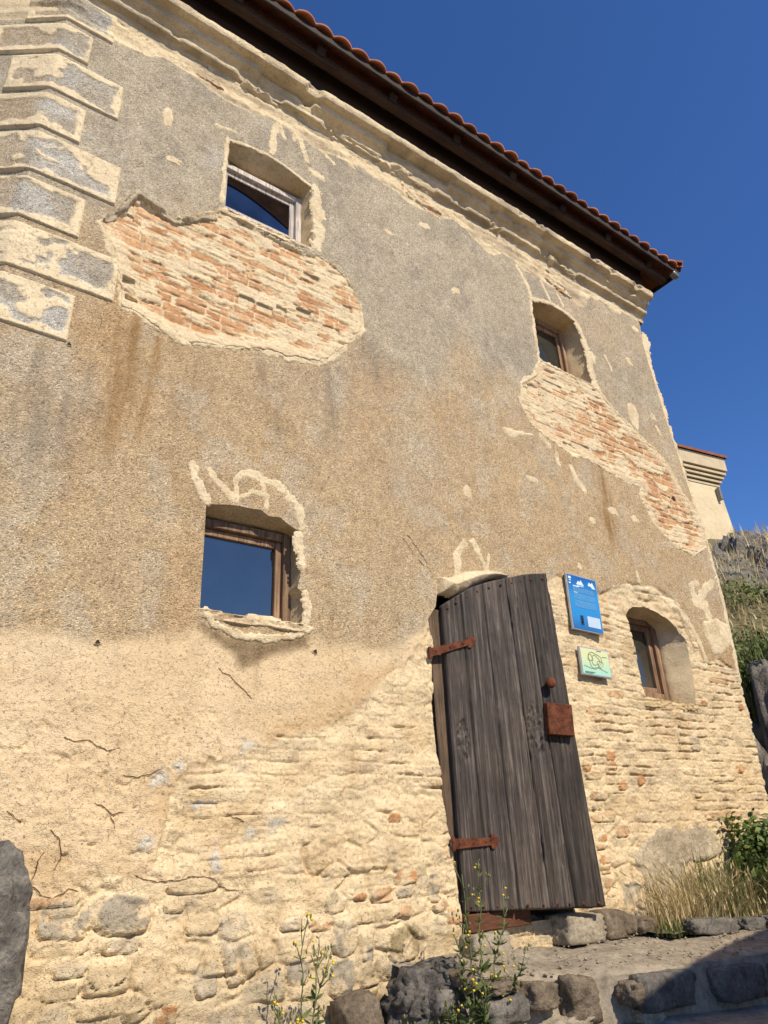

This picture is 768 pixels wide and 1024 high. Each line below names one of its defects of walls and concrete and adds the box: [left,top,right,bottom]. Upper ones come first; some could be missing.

spalling [400,180,442,230]
spalling [96,137,367,369]
spalling [503,264,707,558]
spalling [202,590,314,644]
crack [220,669,252,699]
crack [64,737,120,751]
crack [124,769,160,779]
crack [95,803,123,828]
crack [31,829,78,899]
crack [135,875,238,891]